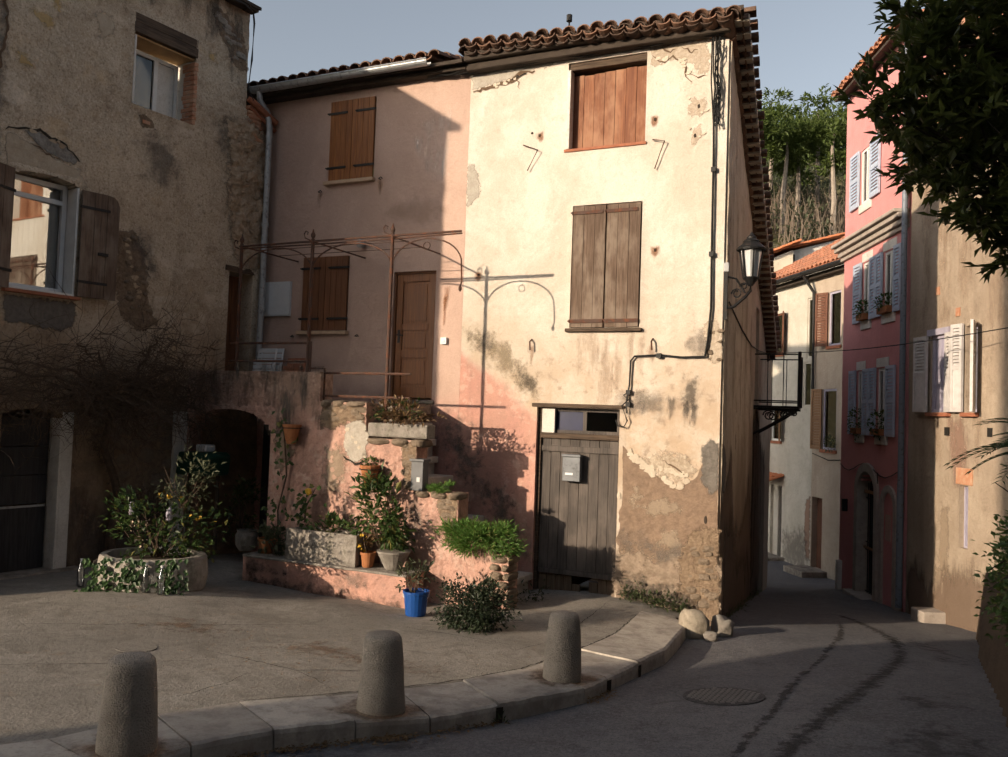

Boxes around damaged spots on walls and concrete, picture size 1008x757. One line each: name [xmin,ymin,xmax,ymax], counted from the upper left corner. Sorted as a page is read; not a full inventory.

leakage [669,381,695,418]
flaking render [611,446,722,627]